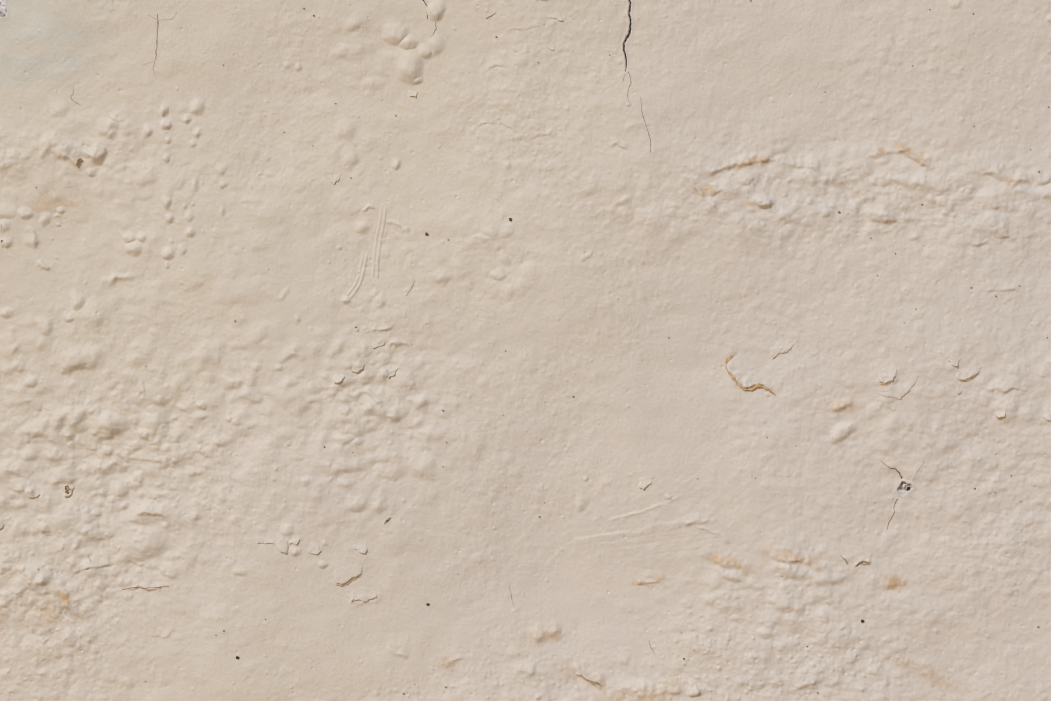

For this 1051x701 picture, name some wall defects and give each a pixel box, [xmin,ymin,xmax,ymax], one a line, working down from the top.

crack [623,0,651,153]
peeling [725,354,774,394]
crack [881,461,927,529]
peeling [333,541,378,602]